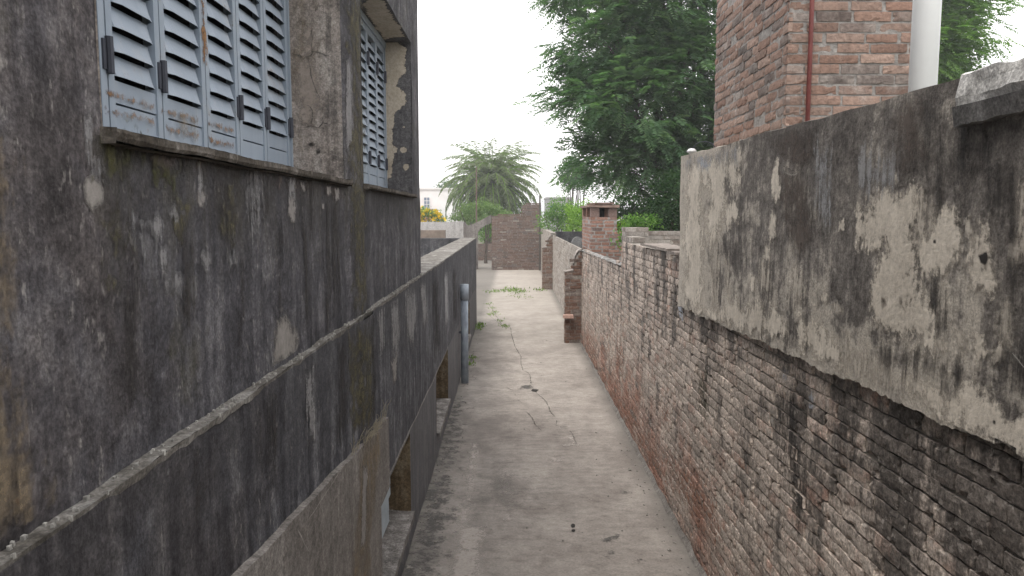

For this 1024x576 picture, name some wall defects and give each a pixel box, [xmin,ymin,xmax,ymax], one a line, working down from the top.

rust [200,0,208,65]
spalling [84,117,104,211]
rust [107,91,234,147]
peeling [363,0,409,182]
leakage [814,141,832,226]
leakage [858,102,942,210]
leakage [983,129,1024,391]
peeling [266,317,298,372]
leakage [880,339,961,388]
leakage [929,276,947,336]
leakage [767,364,810,528]